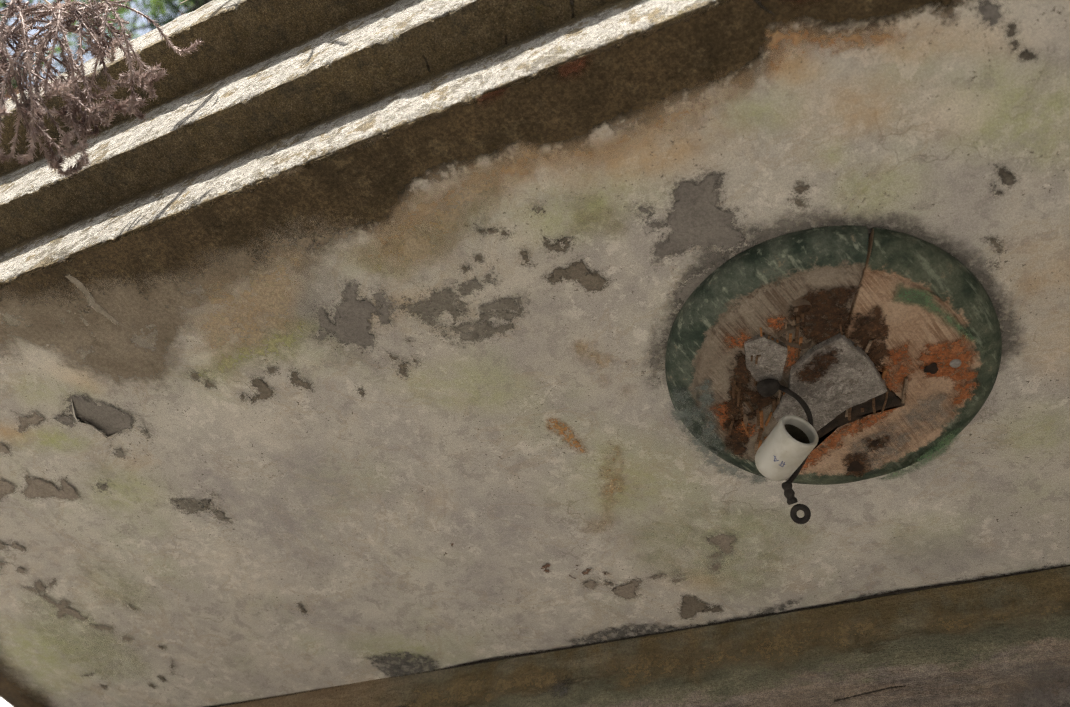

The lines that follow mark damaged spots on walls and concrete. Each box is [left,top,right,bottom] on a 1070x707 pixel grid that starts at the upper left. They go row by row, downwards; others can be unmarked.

leakage [0,0,1019,384]
peeling [519,237,611,293]
peeling [636,171,747,309]
peeling [314,255,529,349]
peeling [14,392,151,459]
peeling [0,468,81,501]
peeling [0,539,133,642]
peeling [569,565,688,601]
leakage [569,601,798,646]
peeling [678,595,725,620]
leakage [369,652,572,707]
crack [834,686,905,702]